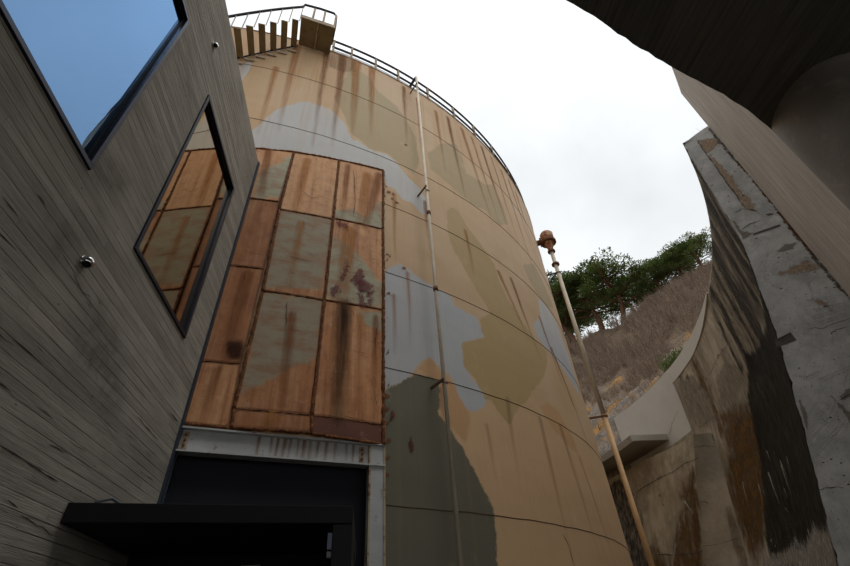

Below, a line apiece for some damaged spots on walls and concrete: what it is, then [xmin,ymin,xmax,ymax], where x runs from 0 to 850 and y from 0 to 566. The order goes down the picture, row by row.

rust [337,54,359,94]
rust [435,111,524,217]
rust [227,341,243,358]
rust [337,301,350,394]
water stain [679,159,838,566]
water stain [610,470,701,566]